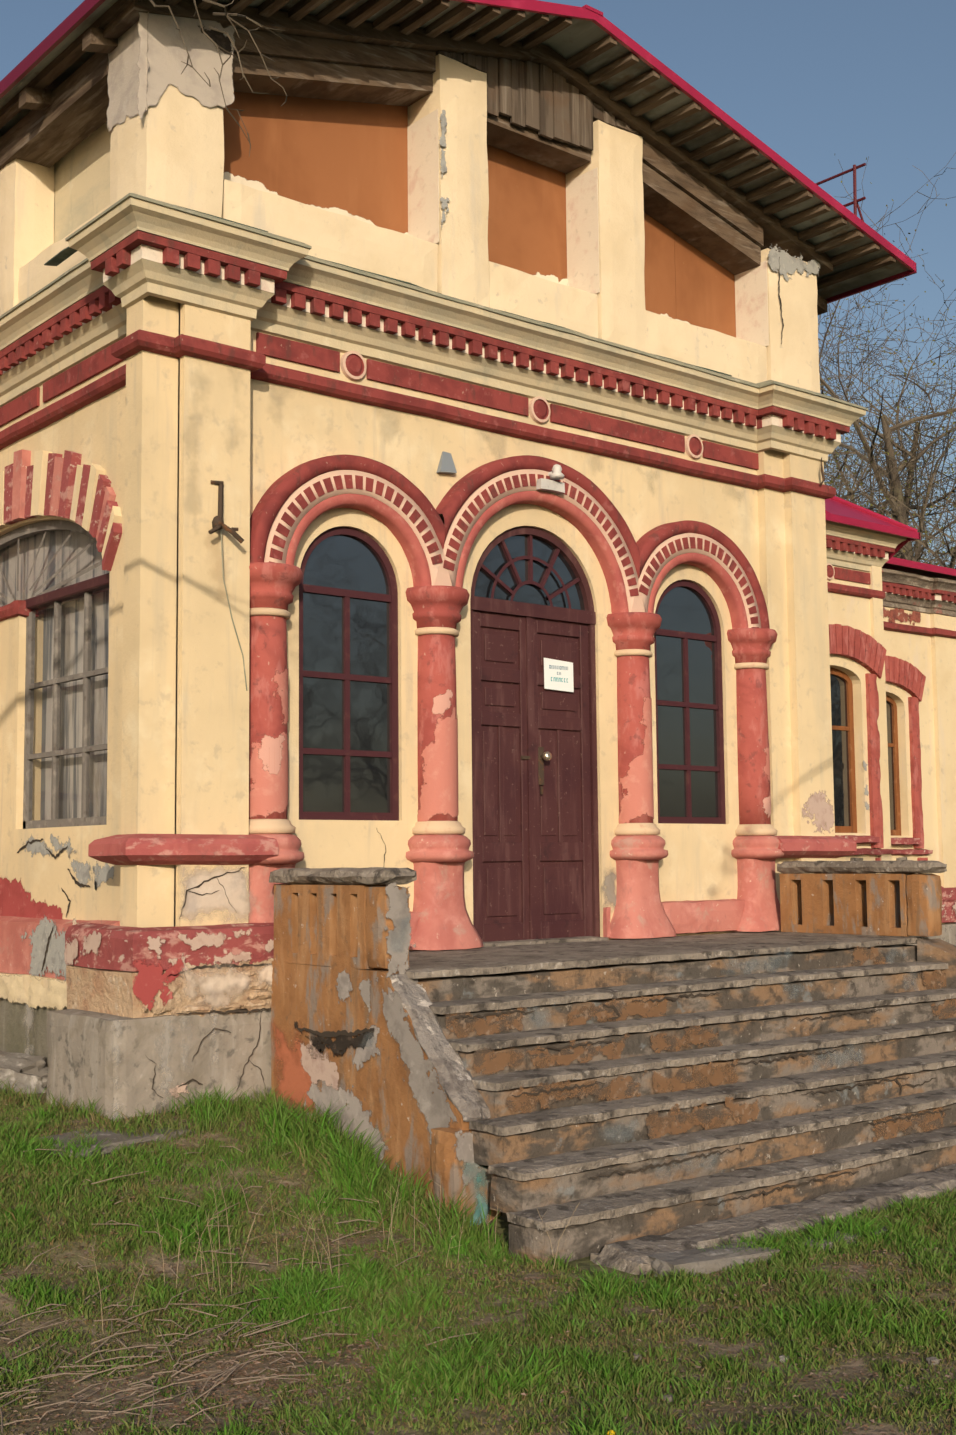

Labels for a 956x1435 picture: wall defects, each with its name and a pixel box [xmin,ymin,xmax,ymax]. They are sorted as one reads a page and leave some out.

spalling [198,24,232,54]
peeling [249,668,288,818]
peeling [417,689,459,822]
peeling [618,697,654,824]
spalling [17,834,114,981]
spalling [169,1079,203,1098]
spalling [130,929,274,1017]
crack [170,963,272,976]
crack [176,1008,271,1091]
spalling [294,882,482,1186]